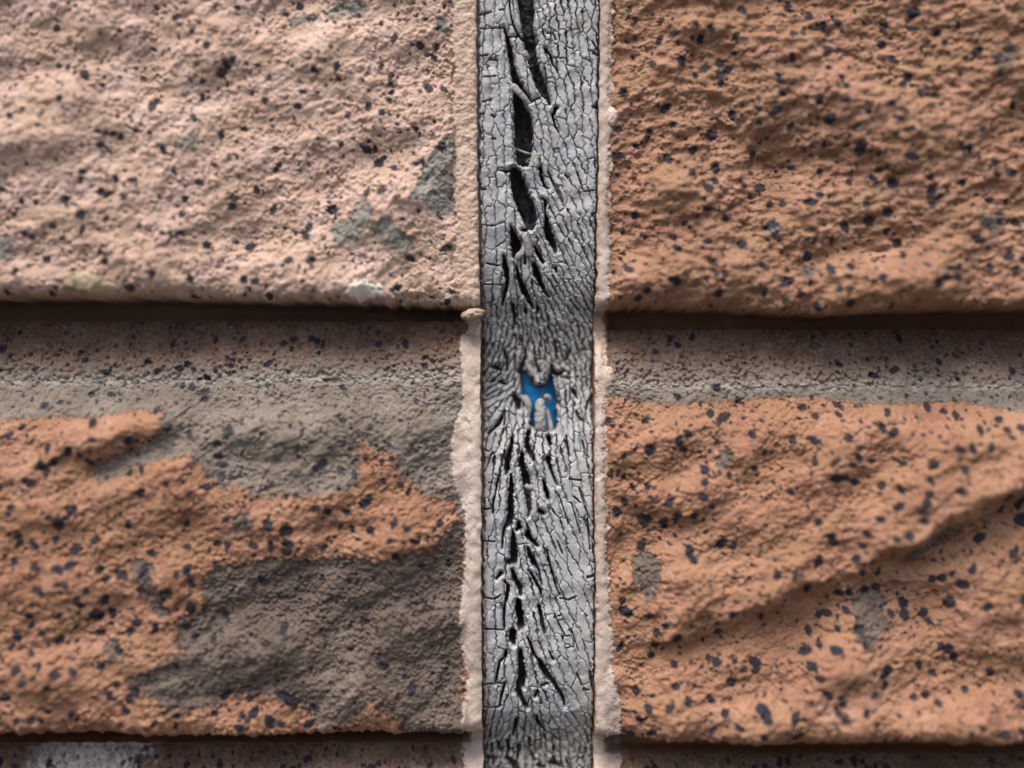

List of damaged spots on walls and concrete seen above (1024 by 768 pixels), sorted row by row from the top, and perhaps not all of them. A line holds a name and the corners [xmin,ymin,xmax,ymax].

crack [499,0,559,330]
crack [485,415,569,768]